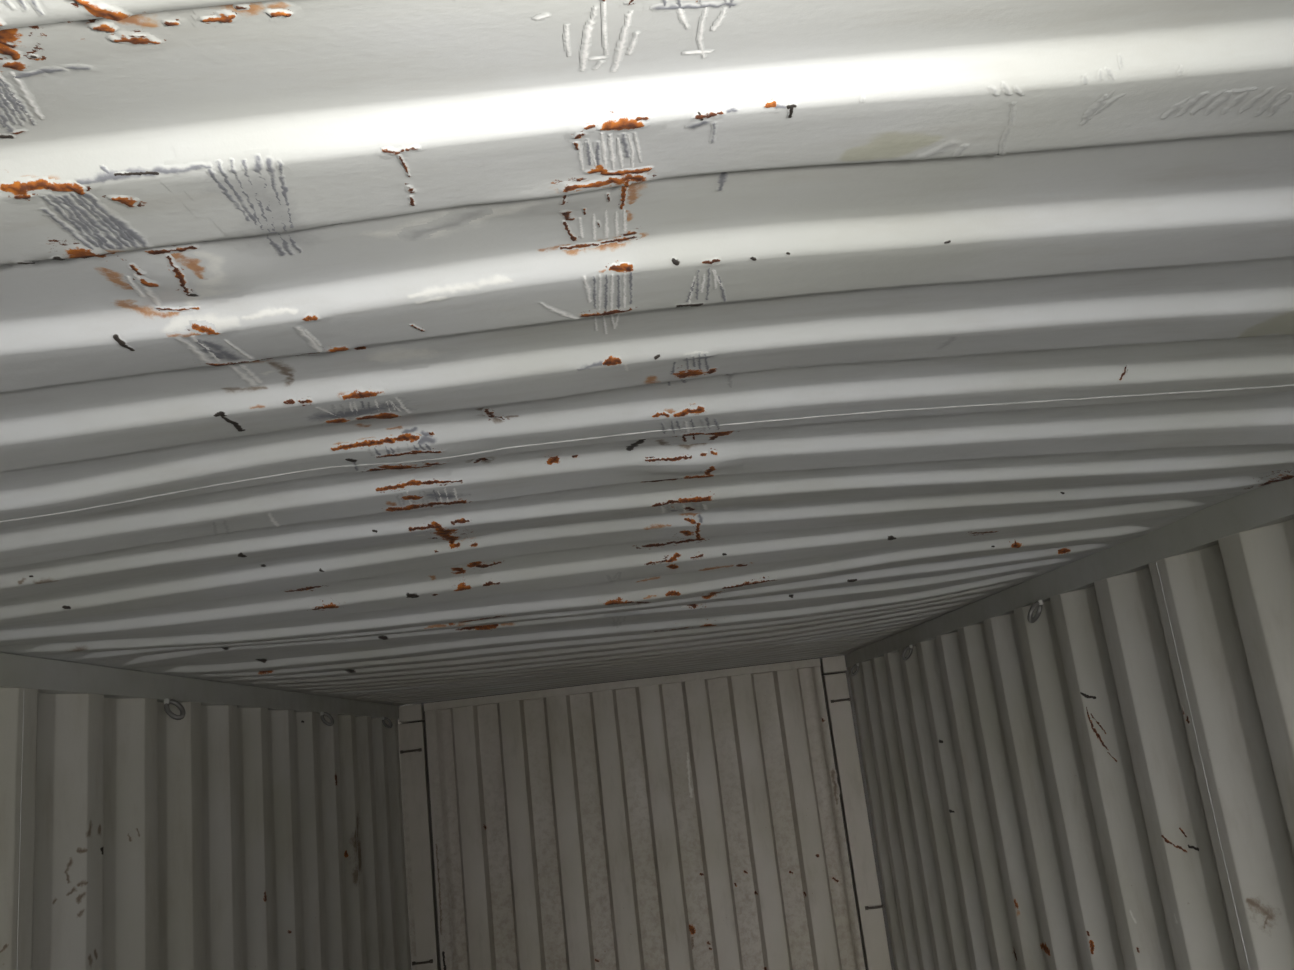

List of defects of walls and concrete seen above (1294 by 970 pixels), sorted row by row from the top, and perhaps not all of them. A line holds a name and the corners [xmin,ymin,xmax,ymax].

rust [600,0,761,19]
rust [0,0,306,96]
rust [758,90,799,118]
rust [0,159,167,214]
rust [531,90,742,276]
rust [0,225,236,340]
rust [288,305,334,326]
rust [285,338,380,362]
rust [246,374,522,599]
rust [574,345,783,634]
rust [1229,463,1294,493]
rust [419,603,519,635]